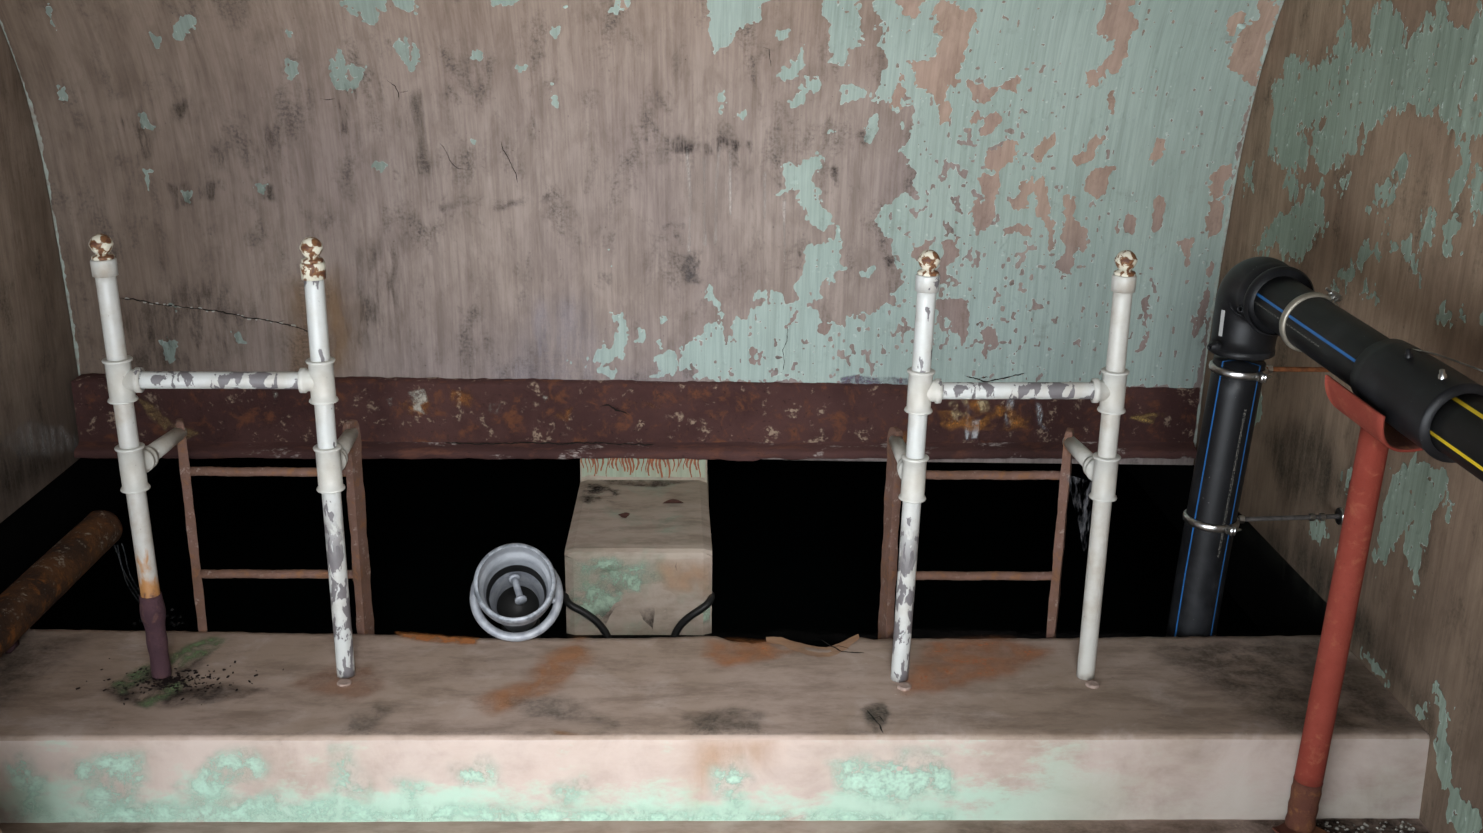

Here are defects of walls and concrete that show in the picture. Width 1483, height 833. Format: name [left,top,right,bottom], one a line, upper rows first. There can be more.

peeling [339,0,419,25]
peeling [149,15,197,49]
peeling [328,48,367,93]
peeling [393,36,421,72]
peeling [470,49,483,61]
spalling [0,20,81,376]
peeling [566,0,1483,447]
peeling [159,337,178,364]
corrosion [580,458,705,478]
peeling [1309,519,1338,559]
peeling [1372,451,1455,599]
water stain [866,707,888,724]